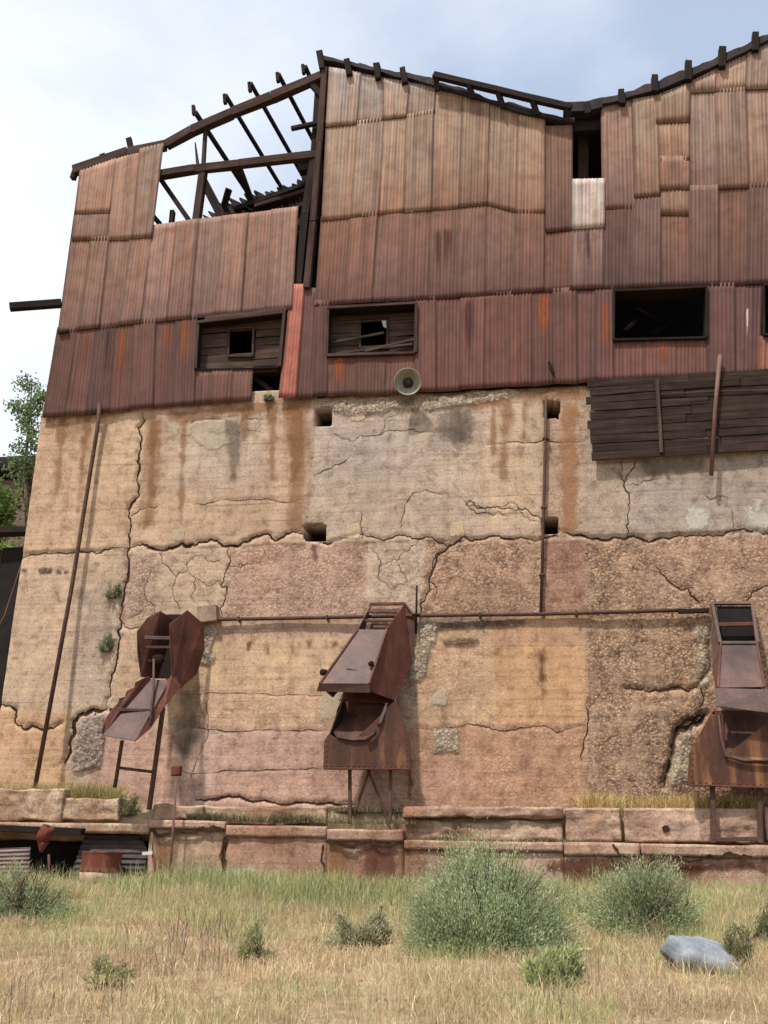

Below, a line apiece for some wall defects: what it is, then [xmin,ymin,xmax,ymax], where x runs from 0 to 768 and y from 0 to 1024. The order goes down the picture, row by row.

spalling [321,396,399,415]
spalling [421,390,508,410]
crack [0,412,768,763]
spalling [408,619,524,683]
spalling [693,624,709,687]
spalling [71,714,104,771]
crack [150,692,354,874]
crack [624,644,711,786]
spalling [667,730,692,785]